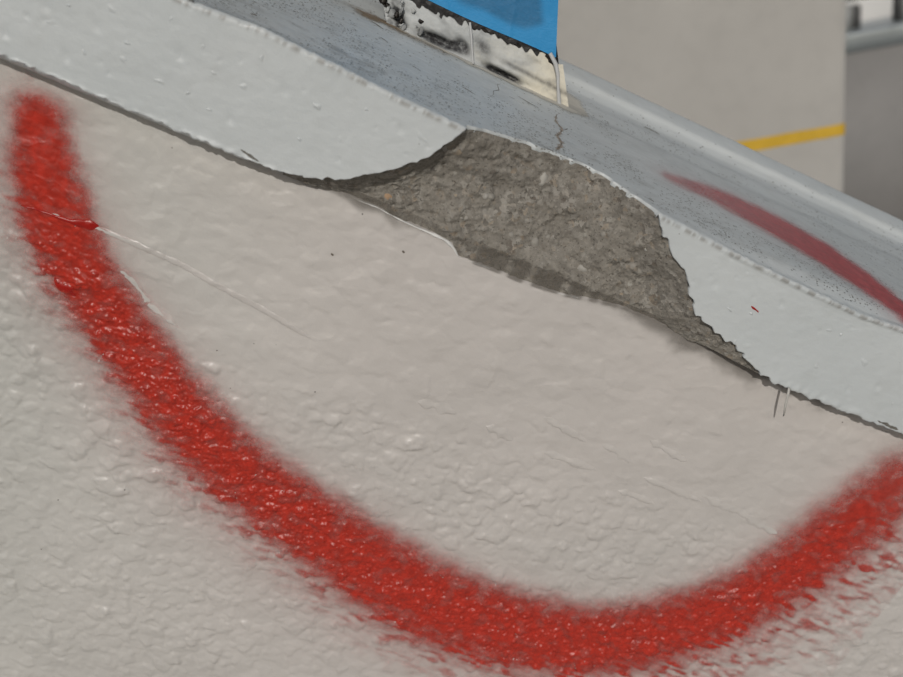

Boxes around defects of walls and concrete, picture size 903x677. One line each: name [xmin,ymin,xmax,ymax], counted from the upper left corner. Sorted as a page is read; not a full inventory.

spalling [283,129,769,379]
crack [545,115,567,151]